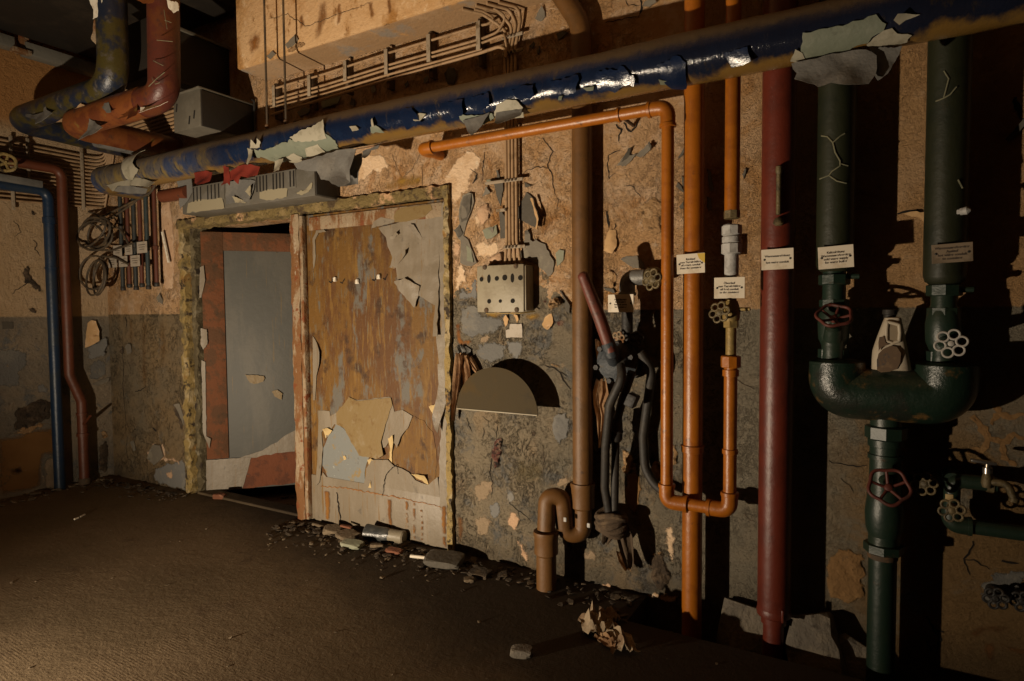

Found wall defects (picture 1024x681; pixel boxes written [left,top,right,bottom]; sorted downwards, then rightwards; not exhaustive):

peeling [518,182,564,277]
peeling [85,320,110,386]
rust [200,232,291,459]
peeling [313,151,526,537]
spalling [14,399,51,435]
flaking render [826,549,866,604]